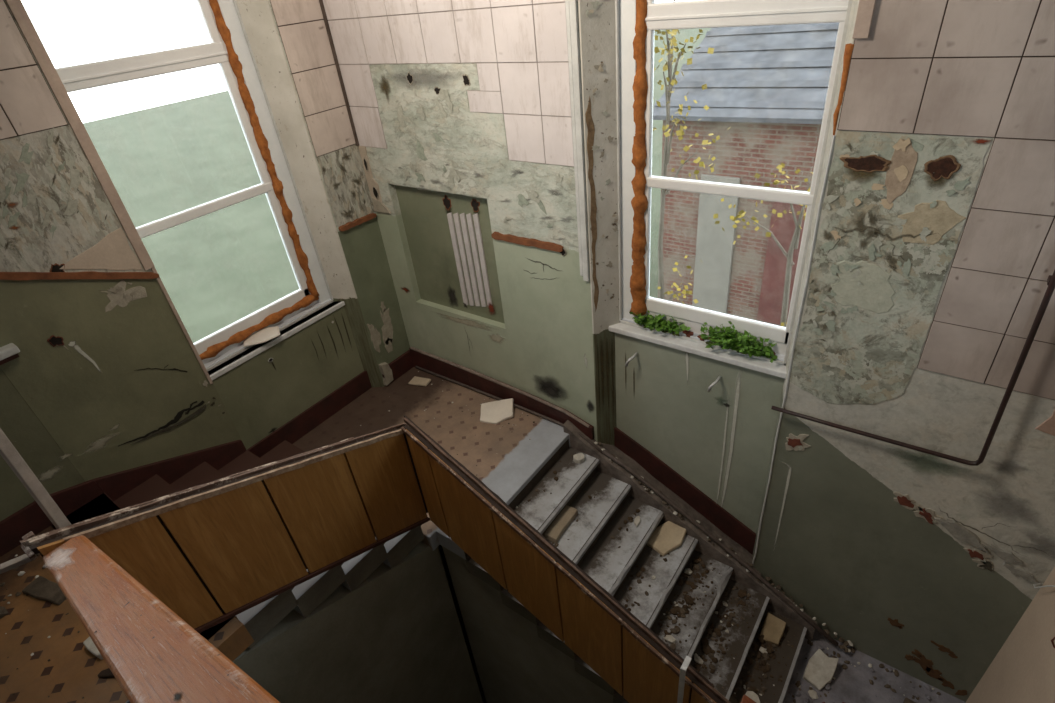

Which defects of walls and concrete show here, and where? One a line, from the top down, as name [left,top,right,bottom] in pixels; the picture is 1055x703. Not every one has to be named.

flaking render [316,63,579,256]
peeling [585,61,619,312]
flaking render [0,125,147,312]
flaking render [789,131,992,405]
crack [119,400,206,446]
flaking render [785,433,810,451]
flaking render [893,492,943,524]
crack [940,510,1044,552]
peeling [905,640,967,696]